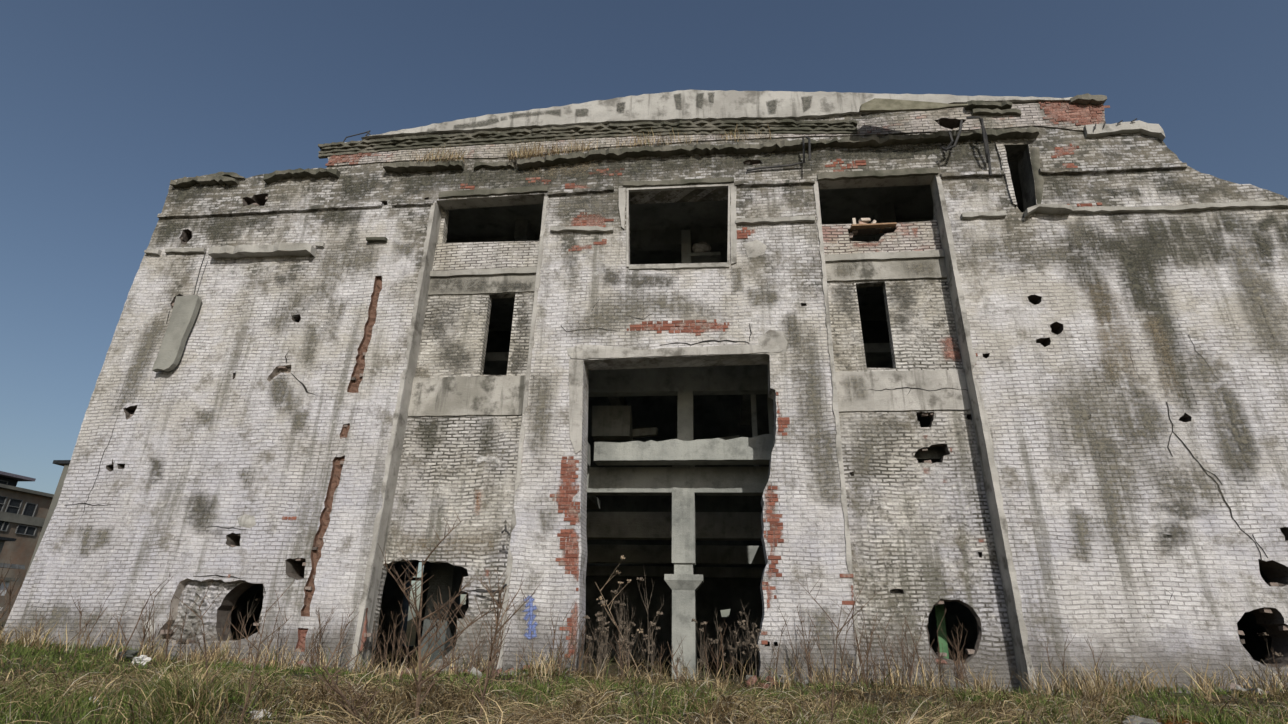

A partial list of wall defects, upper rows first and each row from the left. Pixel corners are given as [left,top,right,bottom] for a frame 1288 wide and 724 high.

spalling [1030,144,1079,204]
damp [115,319,166,409]
damp [271,275,298,328]
damp [272,375,307,431]
damp [305,247,373,362]
flaking render [627,319,729,336]
damp [972,212,1288,562]
crack [1166,402,1268,560]
flaking render [550,456,580,658]
flaking render [762,486,784,608]
spalling [156,574,266,645]
hole [1237,607,1288,667]